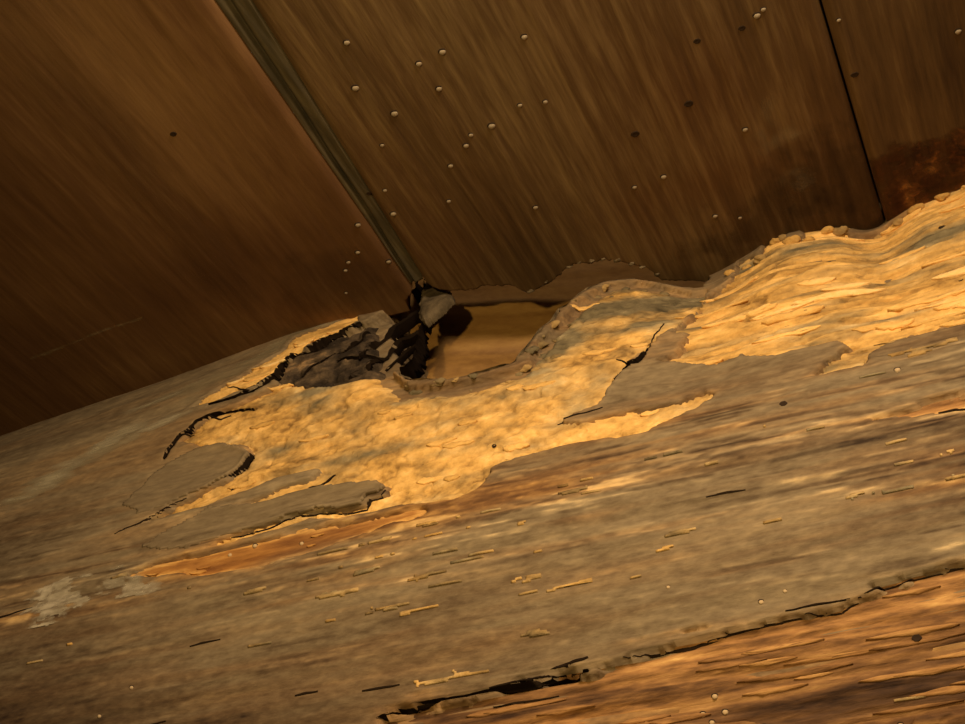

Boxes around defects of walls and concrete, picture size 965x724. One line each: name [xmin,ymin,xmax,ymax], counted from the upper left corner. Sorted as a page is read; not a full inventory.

crack [163,279,432,459]
spalling [111,185,965,589]
spalling [315,552,395,599]
crack [623,568,965,659]
crack [362,656,589,721]